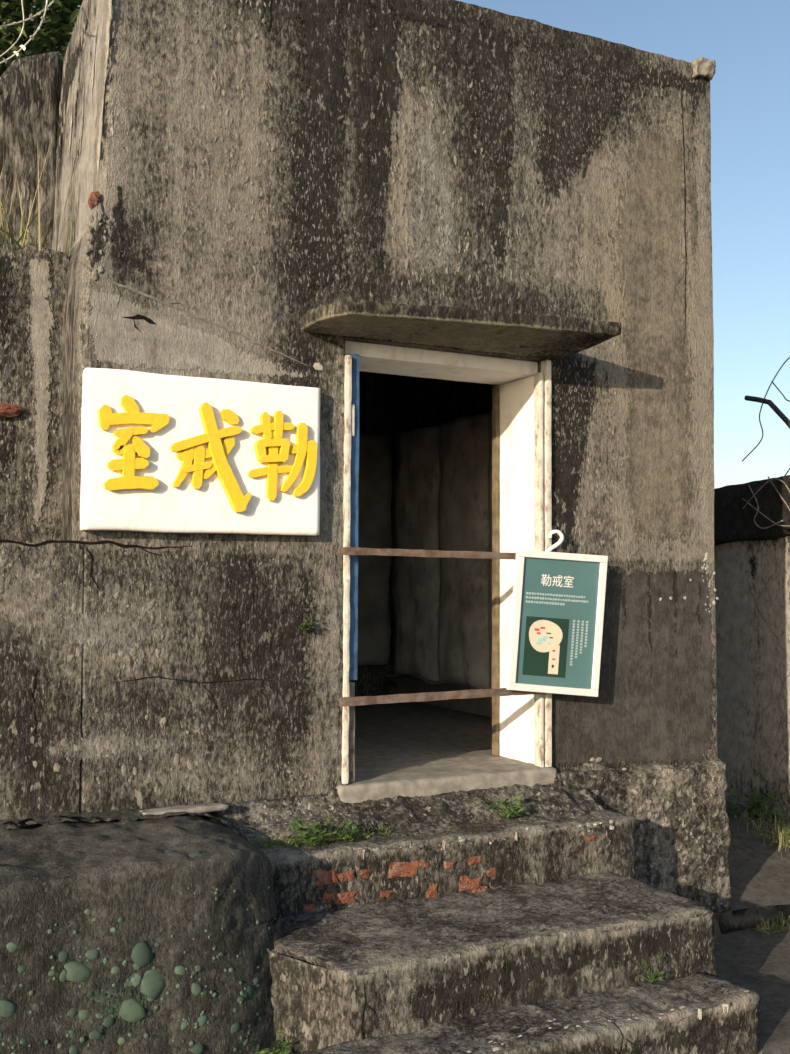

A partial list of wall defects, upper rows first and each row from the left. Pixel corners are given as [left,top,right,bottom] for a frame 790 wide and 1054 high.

damp [286,0,707,325]
damp [110,183,128,270]
crack [0,539,191,592]
damp [749,554,757,595]
crack [114,666,272,709]
damp [552,569,717,768]
flaking render [303,867,372,913]
flaking render [379,858,429,901]
flaking render [426,883,438,898]
flaking render [444,856,495,893]